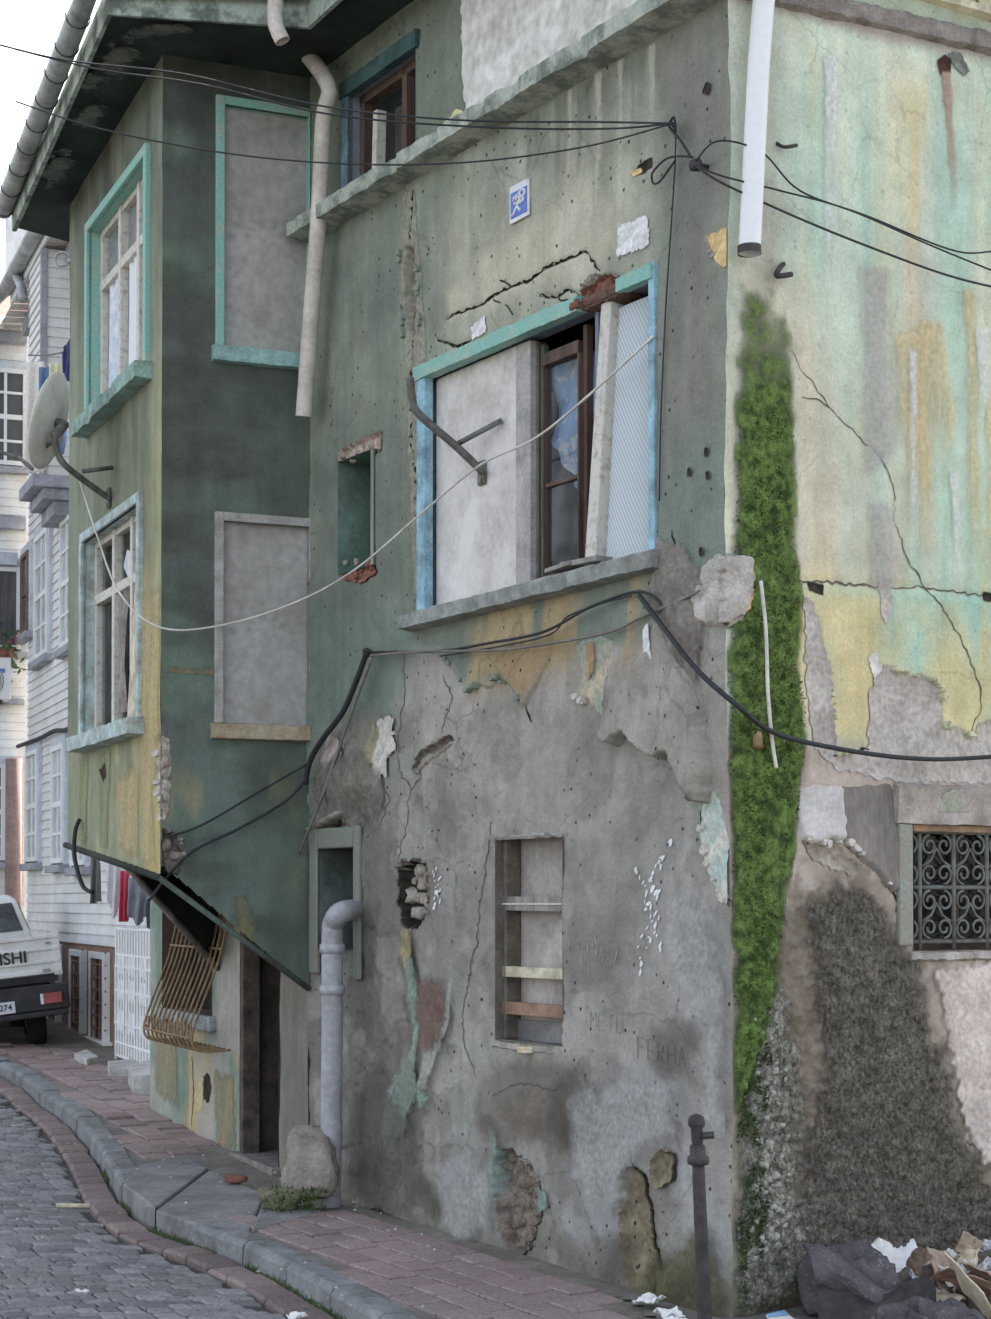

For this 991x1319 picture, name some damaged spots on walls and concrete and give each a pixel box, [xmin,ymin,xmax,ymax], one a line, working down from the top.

corrosion [938,51,969,161]
crack [395,190,600,594]
crack [792,351,991,730]
flaking render [407,610,551,722]
flaking render [151,735,186,875]
peeling [363,716,396,778]
spalling [411,735,454,774]
flaking render [570,587,733,910]
peeling [797,597,991,913]
water stain [636,882,991,1318]
flaking render [487,1128,547,1255]
flaking render [616,1148,675,1289]